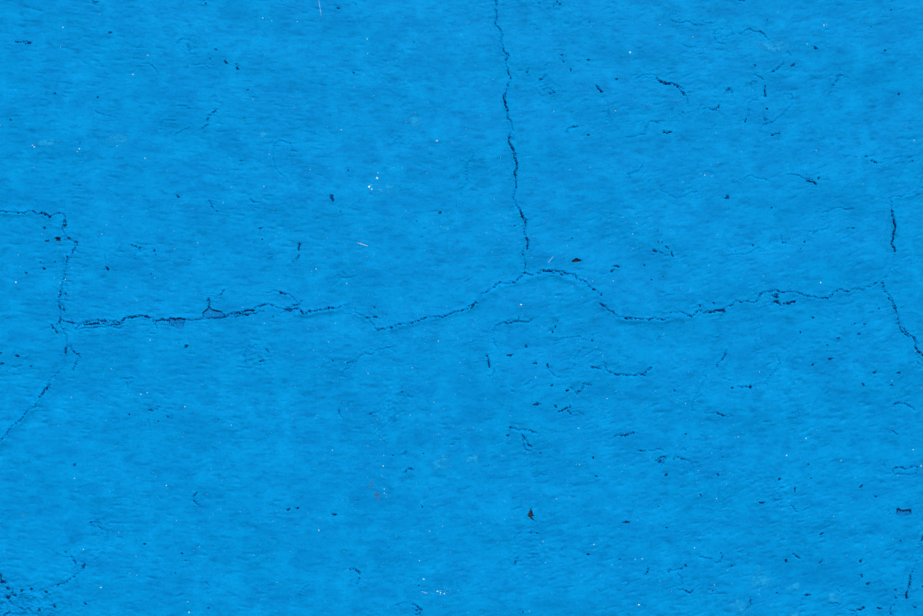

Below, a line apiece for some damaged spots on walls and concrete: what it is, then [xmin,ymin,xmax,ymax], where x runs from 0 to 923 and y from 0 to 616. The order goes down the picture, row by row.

crack [0,0,923,458]
crack [49,550,91,592]